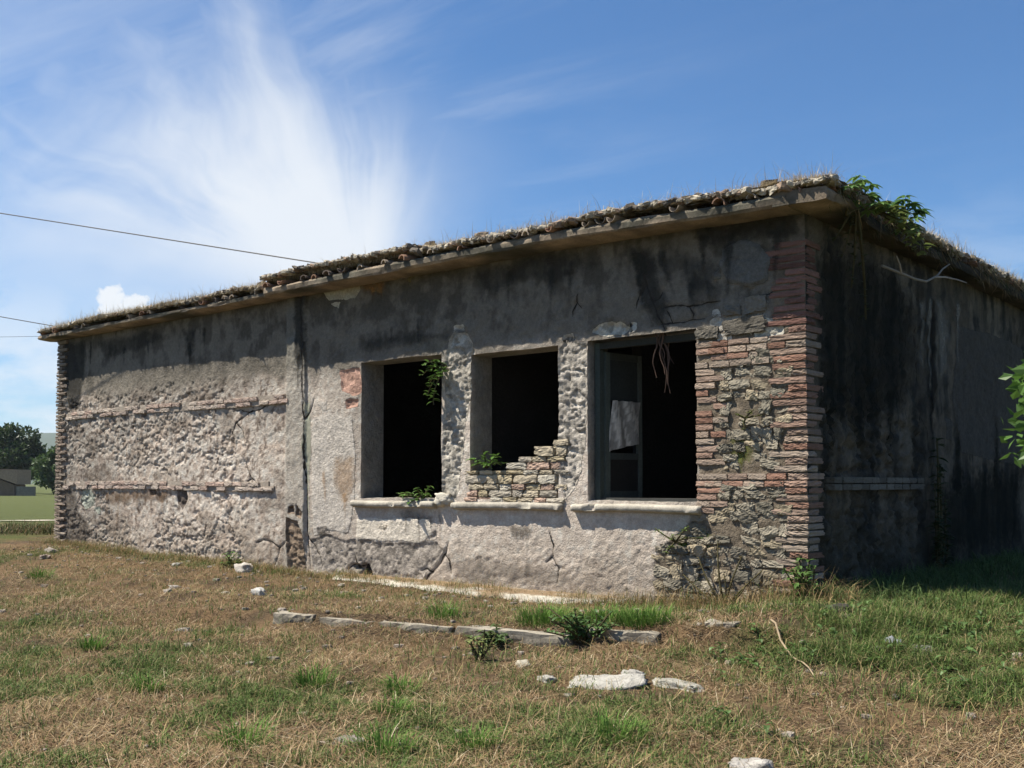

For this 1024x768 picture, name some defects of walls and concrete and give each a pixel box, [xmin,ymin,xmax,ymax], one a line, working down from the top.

crack [232,406,265,494]
crack [256,299,322,569]
water stain [294,296,306,381]
flaking render [285,368,444,579]
flaking render [442,324,475,500]
flaking render [558,321,637,499]
crack [636,269,718,330]
water stain [920,299,960,425]
water stain [942,427,1023,556]
crack [420,545,451,580]
flaking render [667,530,714,603]